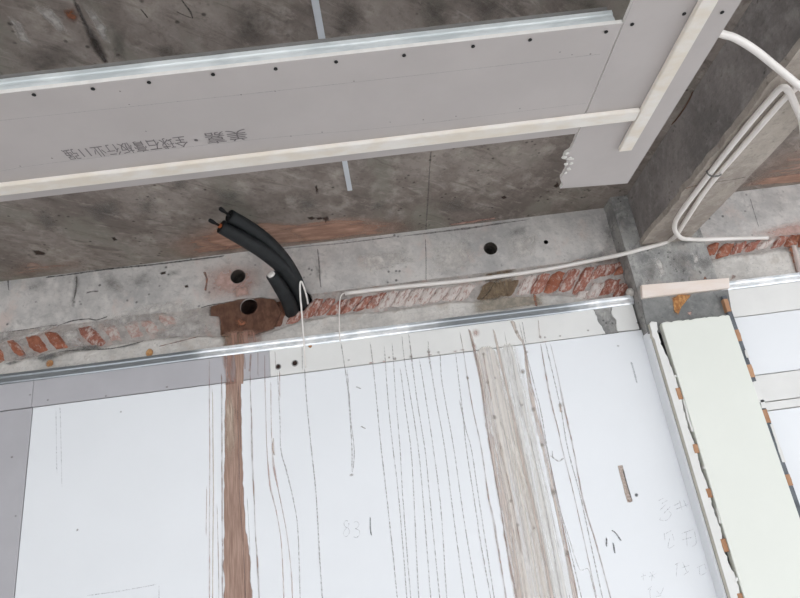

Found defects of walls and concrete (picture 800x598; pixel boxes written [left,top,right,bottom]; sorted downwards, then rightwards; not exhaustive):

flaking render [275,259,628,327]
damp [386,341,453,487]
damp [460,321,581,598]